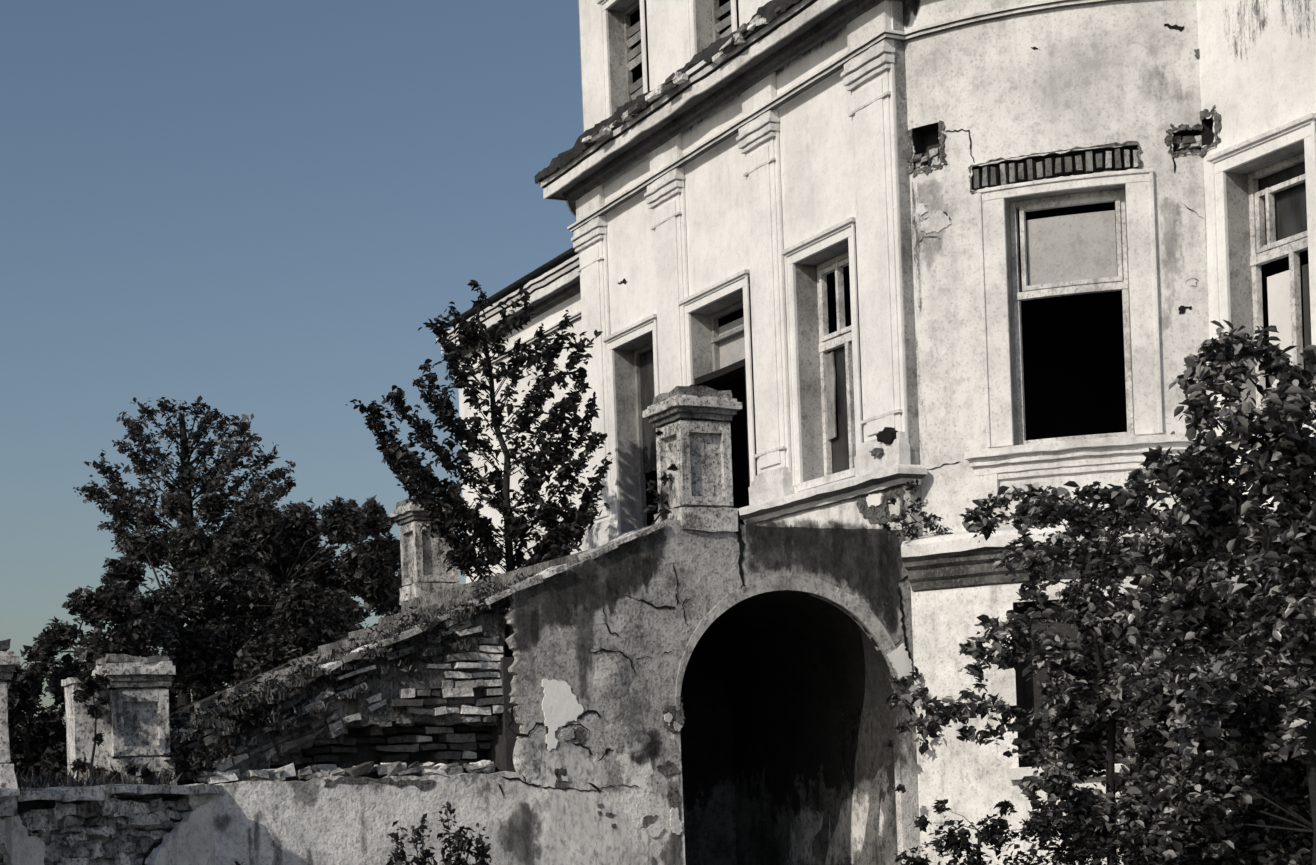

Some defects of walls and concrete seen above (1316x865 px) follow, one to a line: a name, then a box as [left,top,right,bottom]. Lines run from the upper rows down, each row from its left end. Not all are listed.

water stain [1225,0,1267,56]
hole [906,120,948,178]
flaking render [968,141,1143,194]
spalling [1164,105,1222,158]
water stain [513,528,666,699]
crack [591,565,693,676]
crack [736,511,746,589]
water stain [746,519,902,634]
crack [498,706,639,798]
flaking render [1,800,56,817]
water stain [501,748,626,865]
water stain [642,782,683,865]